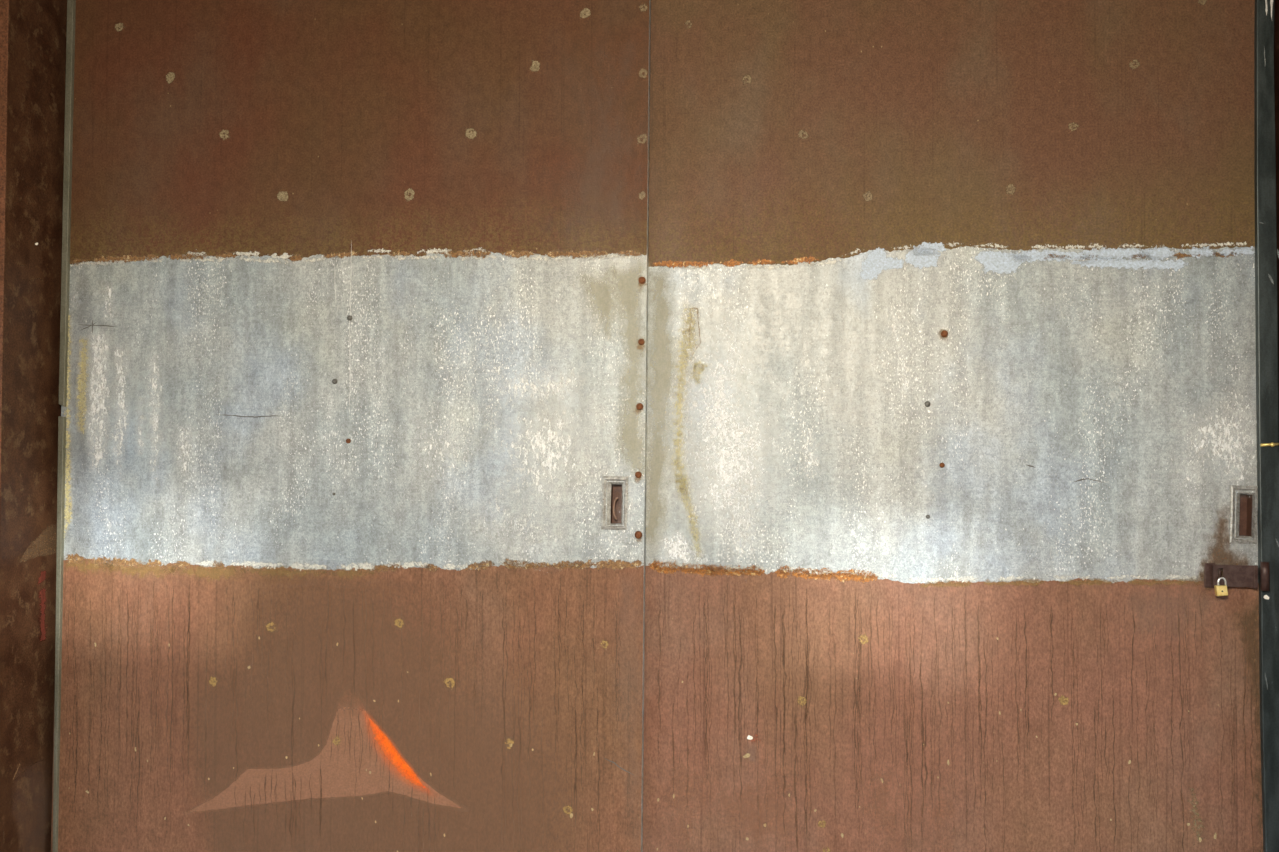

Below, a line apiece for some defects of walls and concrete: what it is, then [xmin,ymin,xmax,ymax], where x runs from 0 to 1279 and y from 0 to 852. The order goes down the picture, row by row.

rust [72,249,237,265]
peeling [179,251,325,264]
rust [324,250,360,258]
peeling [363,247,496,261]
rust [439,248,819,268]
peeling [805,241,1255,280]
rust [407,291,878,584]
rust [1061,518,1248,585]
peeling [196,560,468,571]
peeling [723,565,977,583]
rust [921,579,1043,587]
rust [1238,605,1263,852]